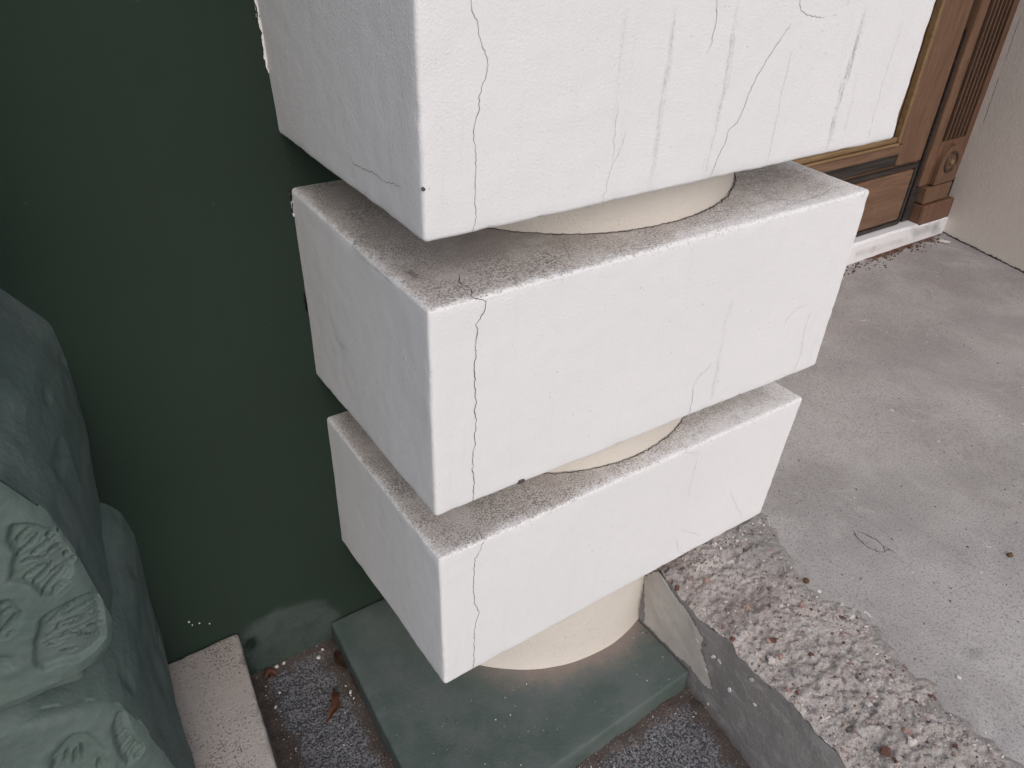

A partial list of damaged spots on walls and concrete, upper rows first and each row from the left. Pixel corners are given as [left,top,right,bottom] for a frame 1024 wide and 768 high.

crack [471,0,835,264]
crack [458,275,486,499]
crack [473,531,484,667]
spalling [644,512,1024,768]